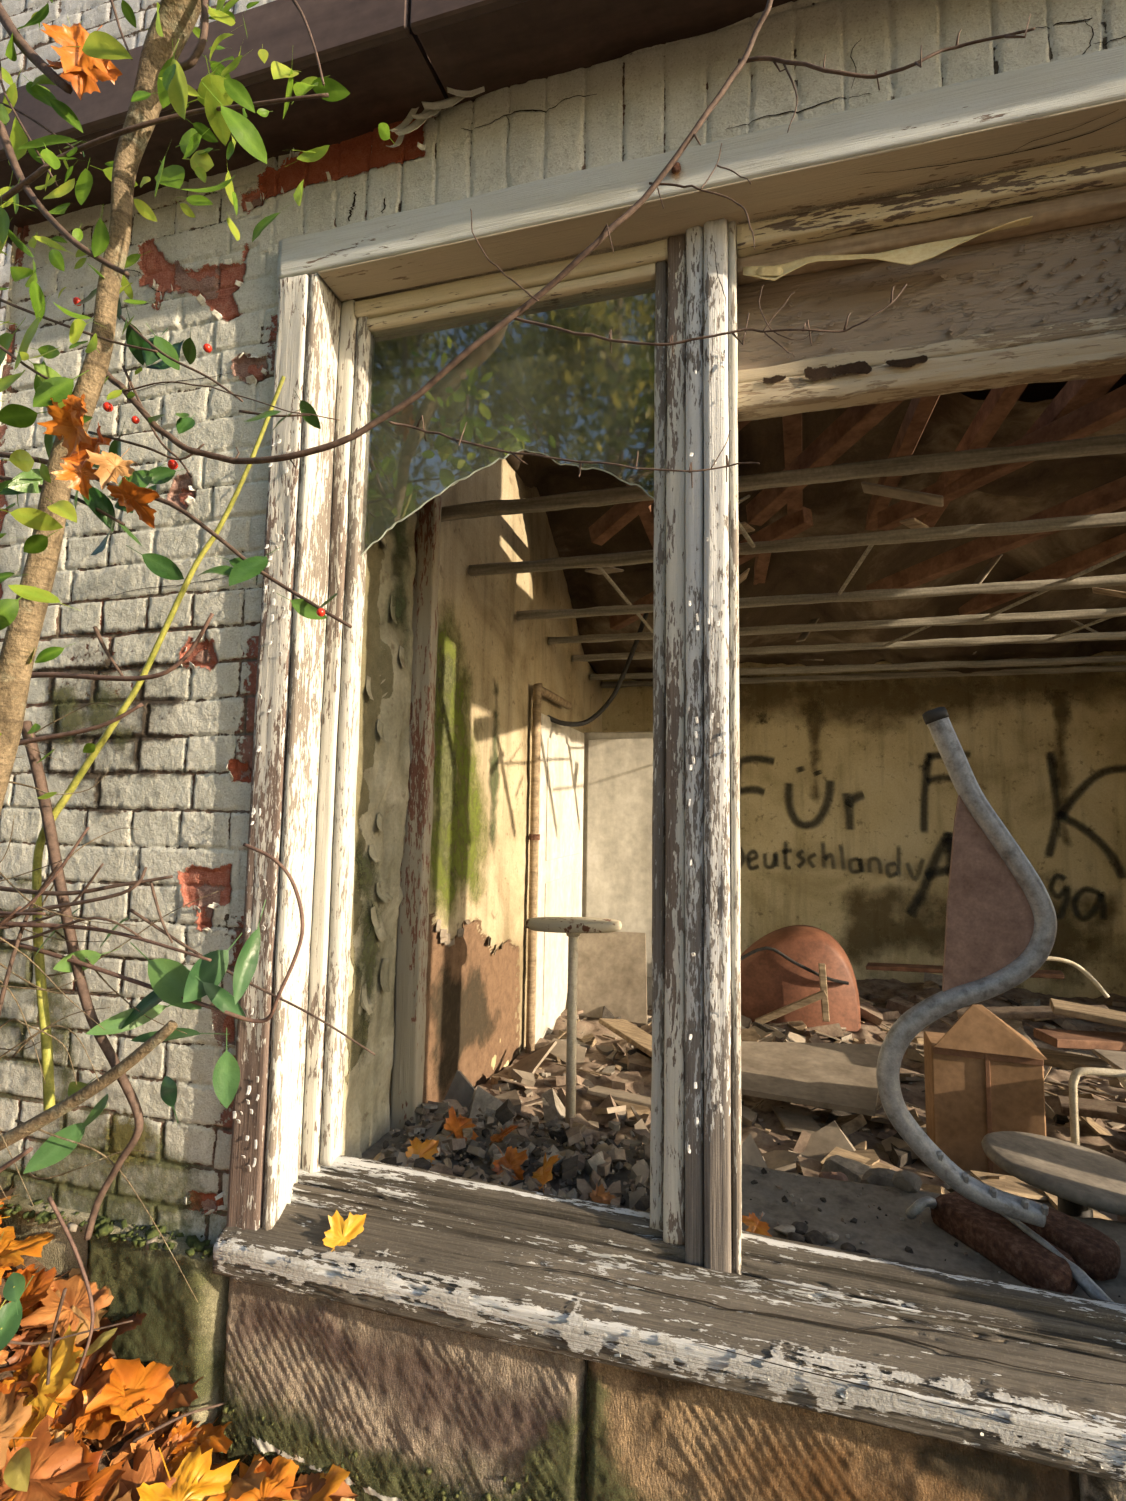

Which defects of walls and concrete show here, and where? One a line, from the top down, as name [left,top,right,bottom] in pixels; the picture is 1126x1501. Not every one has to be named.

crack [1035,18,1126,54]
spalling [240,86,485,214]
crack [463,94,596,144]
crack [725,39,870,130]
crack [860,109,1126,175]
spalling [137,238,250,321]
peeling [743,216,1033,281]
spalling [34,625,218,824]
water stain [248,1305,559,1447]
water stain [637,1372,697,1439]
peeling [215,1232,1126,1501]
water stain [916,1442,1081,1501]